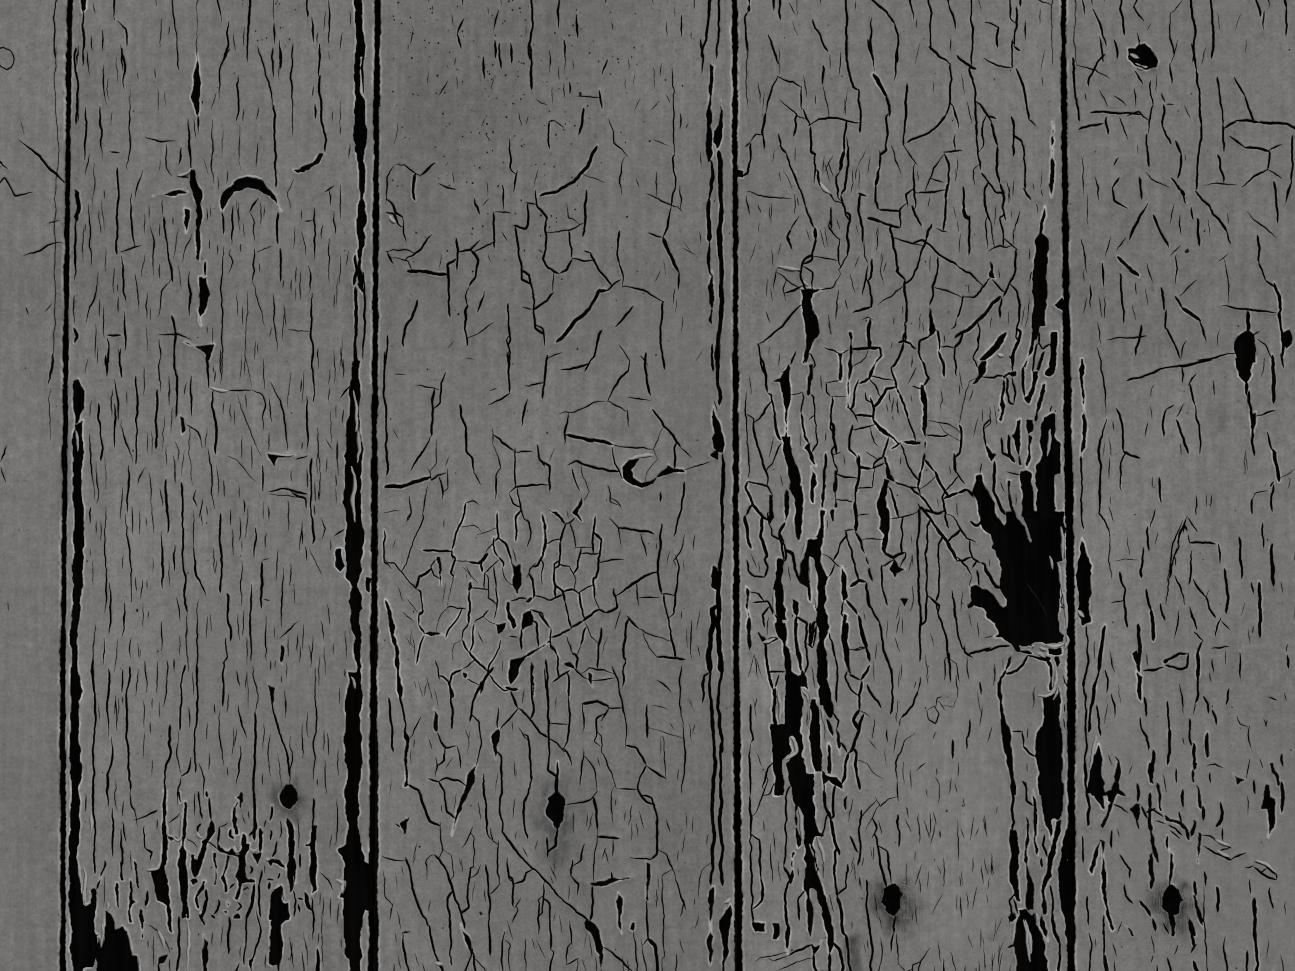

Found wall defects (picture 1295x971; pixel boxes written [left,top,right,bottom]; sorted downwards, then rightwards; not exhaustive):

peeling [68,380,317,971]
crack [382,0,1295,971]
peeling [746,133,1162,971]